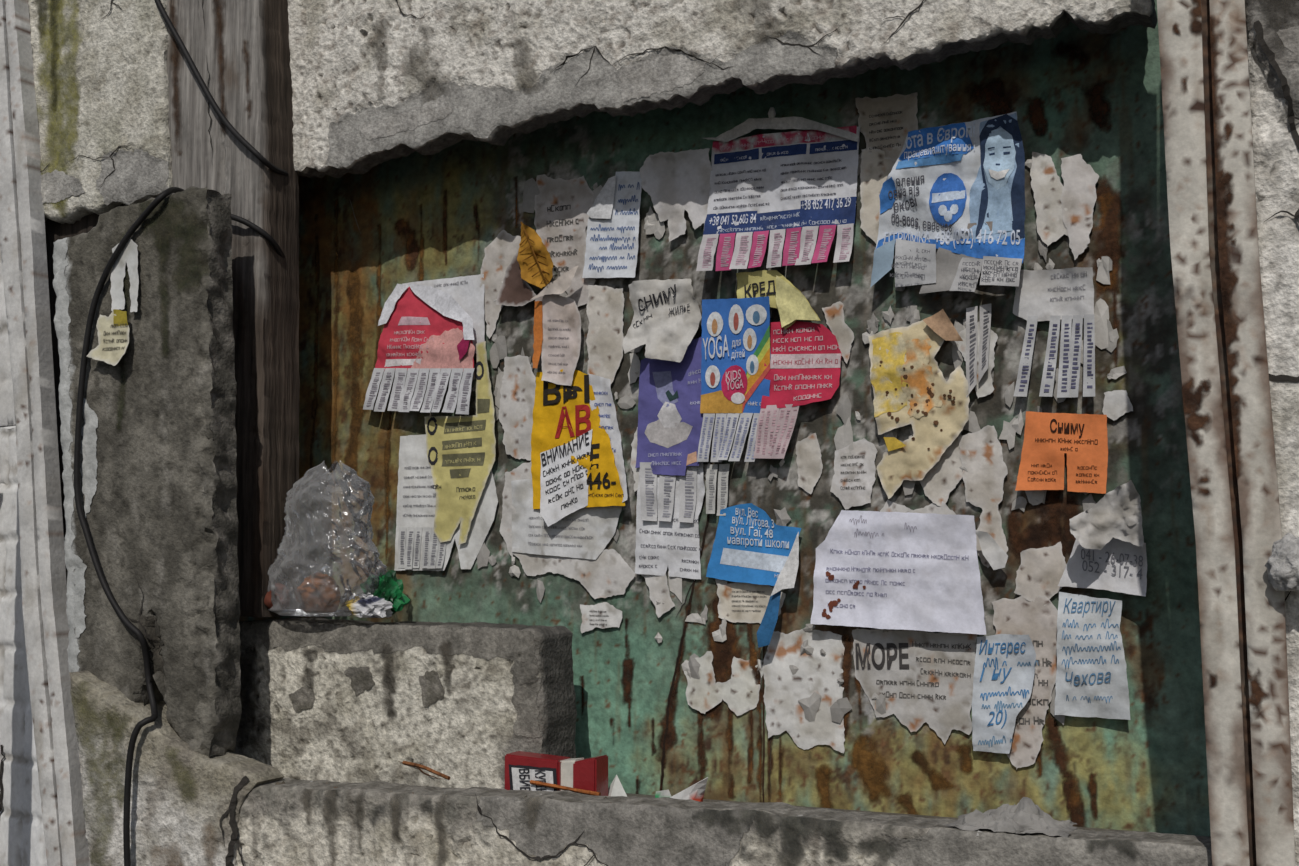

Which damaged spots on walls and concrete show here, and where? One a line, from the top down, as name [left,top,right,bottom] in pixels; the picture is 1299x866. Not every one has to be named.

leakage [36,0,59,110]
spalling [327,30,838,168]
crack [1254,20,1299,149]
corrosion [1173,0,1241,478]
crack [1269,374,1299,382]
corrosion [1007,490,1080,557]
leakage [382,644,395,718]
corrosion [651,597,783,803]
crack [219,776,249,866]
crack [475,794,608,866]
leakage [693,809,896,866]
corrosion [1036,711,1098,827]